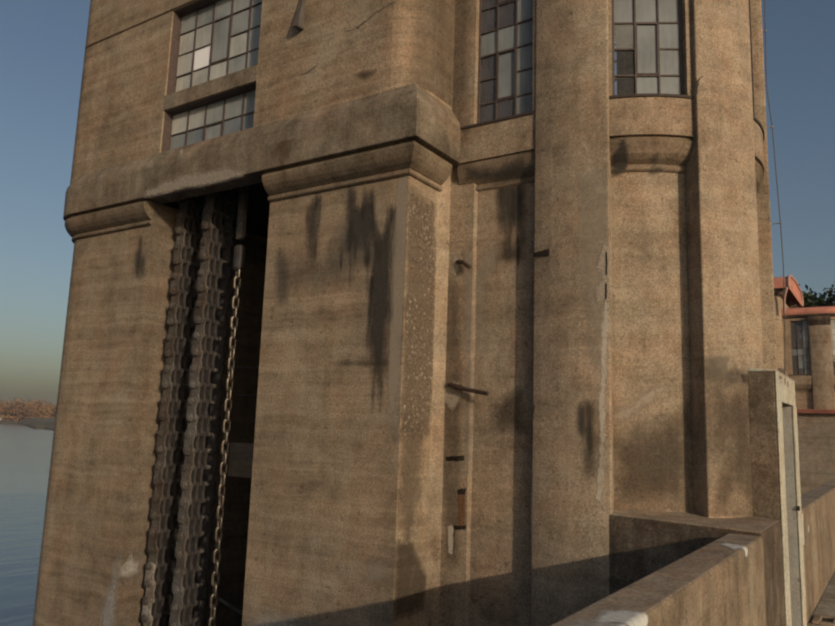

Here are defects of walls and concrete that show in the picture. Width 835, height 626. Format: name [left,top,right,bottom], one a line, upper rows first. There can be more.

leakage [613,141,627,173]
leakage [469,165,528,226]
leakage [348,188,391,388]